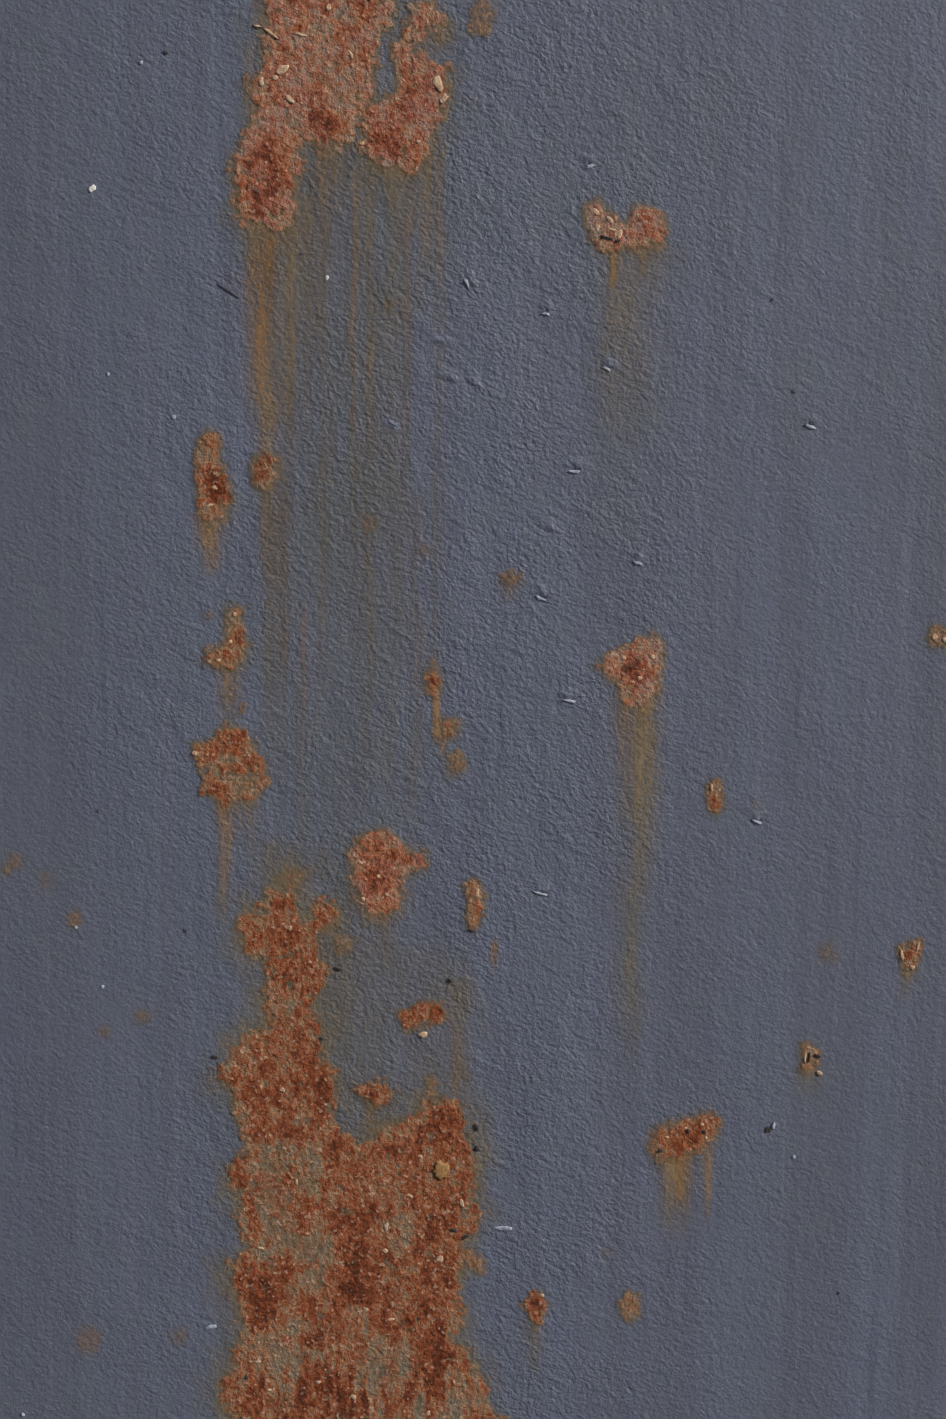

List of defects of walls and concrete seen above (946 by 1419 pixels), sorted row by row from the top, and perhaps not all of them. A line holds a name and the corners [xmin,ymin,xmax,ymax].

rust [224,0,455,492]
rust [584,195,668,287]
rust [193,430,234,557]
rust [192,606,271,890]
rust [423,659,467,772]
rust [596,632,668,856]
rust [704,777,726,813]
rust [347,827,429,923]
rust [896,937,925,977]
rust [212,864,510,1419]
rust [647,1111,722,1202]
rust [519,1289,548,1330]